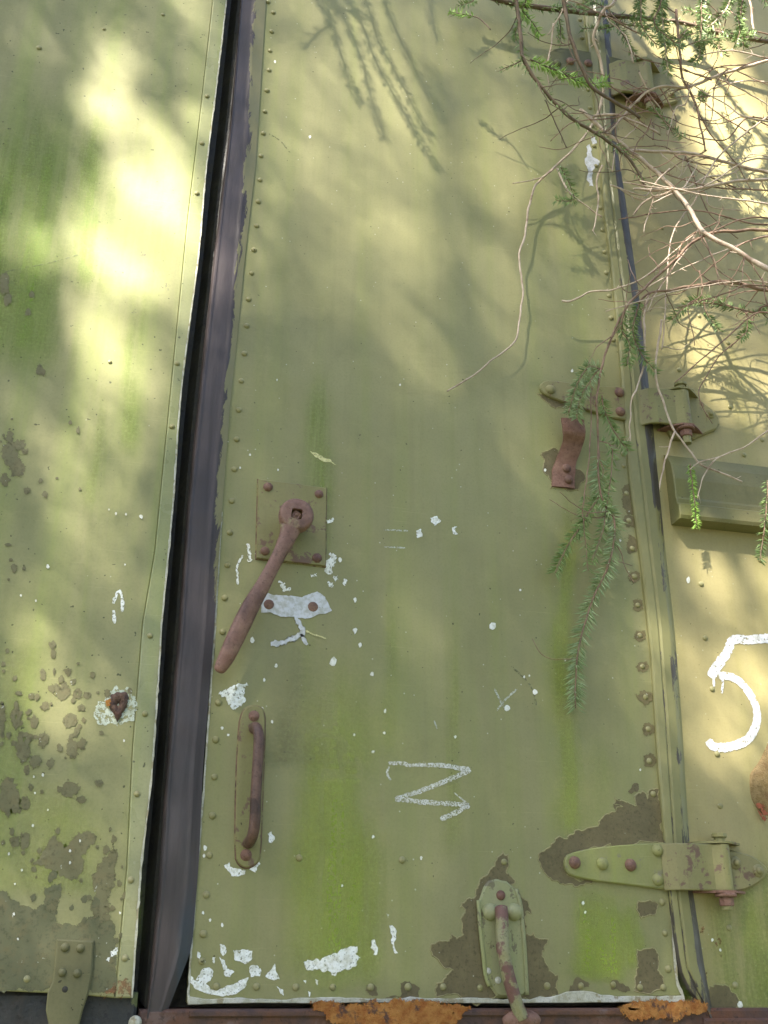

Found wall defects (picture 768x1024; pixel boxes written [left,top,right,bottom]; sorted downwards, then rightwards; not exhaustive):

peeling [0,417,58,499]
peeling [540,447,586,492]
peeling [261,553,347,647]
rust [94,685,137,726]
peeling [0,640,126,993]
peeling [537,783,664,888]
peeling [430,851,590,1006]
spalling [190,944,284,997]
spalling [304,946,360,997]
peeling [610,947,666,995]
rust [310,998,471,1024]
rust [617,996,712,1023]